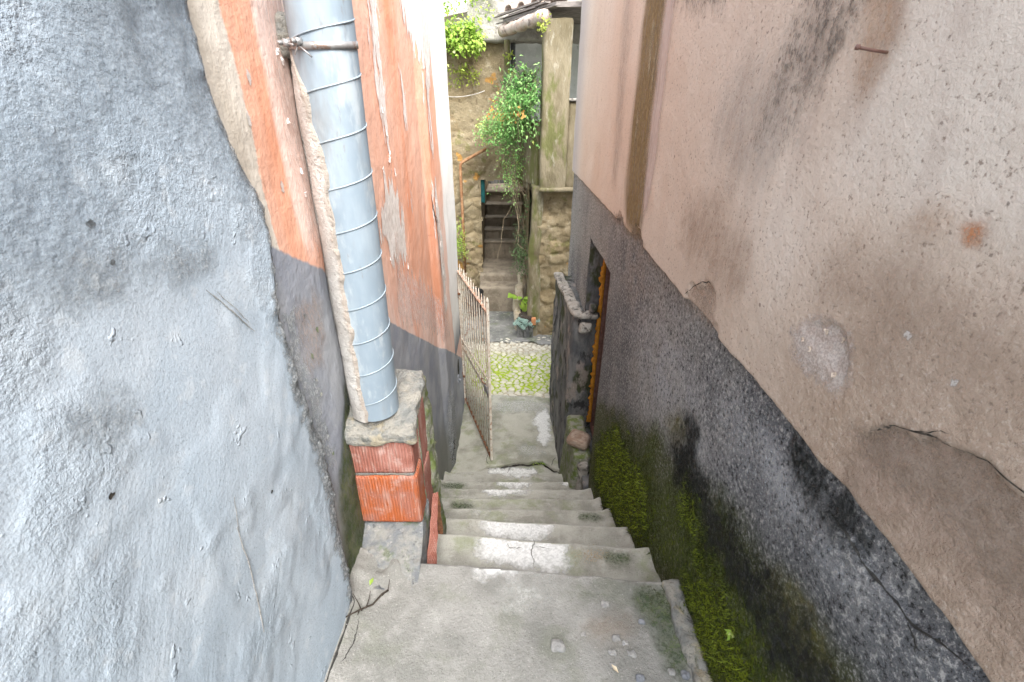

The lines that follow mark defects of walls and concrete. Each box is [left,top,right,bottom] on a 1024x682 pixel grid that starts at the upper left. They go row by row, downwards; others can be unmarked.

peeling [367,0,413,270]
peeling [400,0,434,154]
leakage [780,0,866,129]
spalling [790,319,853,392]
crack [507,539,548,565]
leakage [671,413,831,682]
leakage [790,435,867,546]
crack [831,512,970,668]
crack [878,425,1024,493]